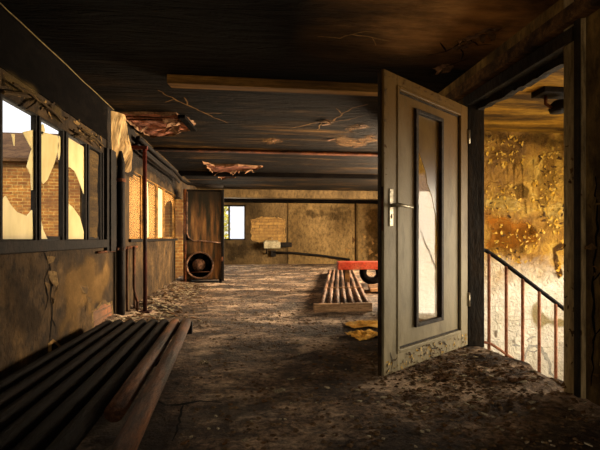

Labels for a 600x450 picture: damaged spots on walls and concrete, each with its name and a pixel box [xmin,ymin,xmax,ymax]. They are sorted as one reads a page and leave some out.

spalling [118,112,197,138]
crack [158,90,227,123]
crack [294,104,368,130]
peeling [328,124,376,149]
spalling [203,161,263,180]
spalling [250,216,286,244]
crack [43,252,59,343]